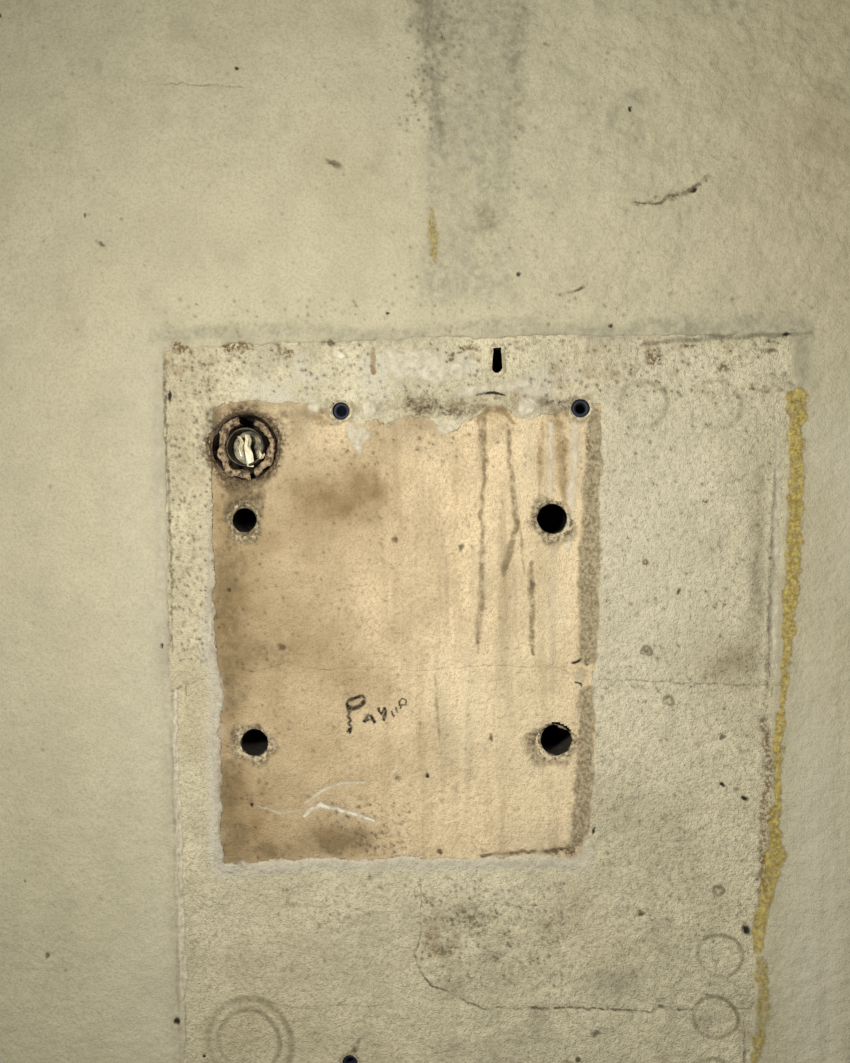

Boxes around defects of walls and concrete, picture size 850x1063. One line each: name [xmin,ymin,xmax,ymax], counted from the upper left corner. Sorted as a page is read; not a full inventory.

leakage [479,405,487,611]
leakage [502,430,519,576]
leakage [548,408,578,549]
peeling [161,324,795,1063]